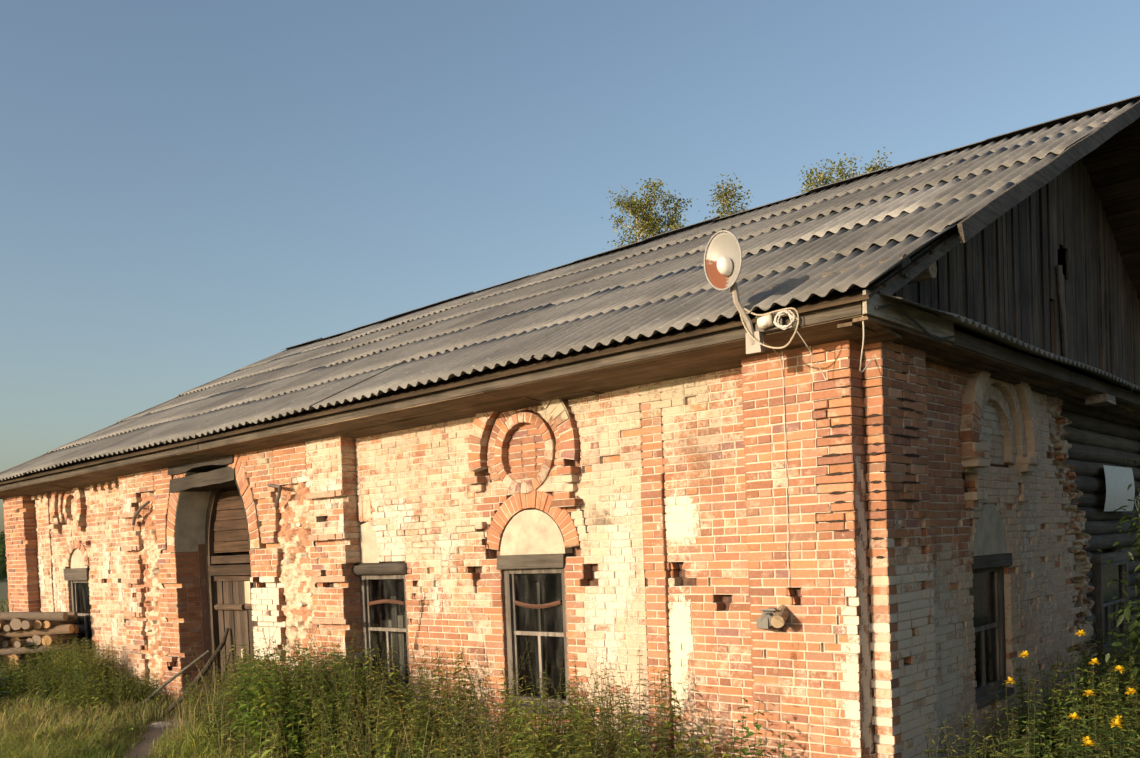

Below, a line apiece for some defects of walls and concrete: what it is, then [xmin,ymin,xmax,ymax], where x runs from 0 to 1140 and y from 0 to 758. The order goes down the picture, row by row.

spalling [122,474,178,702]
spalling [256,470,334,688]
spalling [1039,395,1097,704]